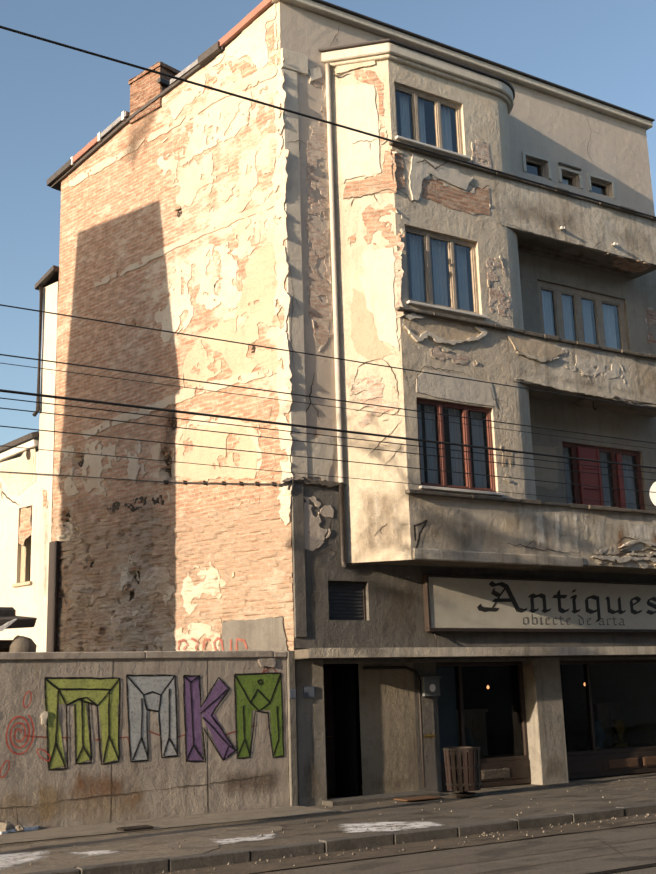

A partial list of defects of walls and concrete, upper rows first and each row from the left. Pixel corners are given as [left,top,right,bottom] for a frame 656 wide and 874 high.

peeling [57,3,335,551]
flaking render [306,60,496,407]
peeling [119,554,141,629]
peeling [153,561,235,651]
flaking render [591,537,656,569]
crack [1,767,278,825]